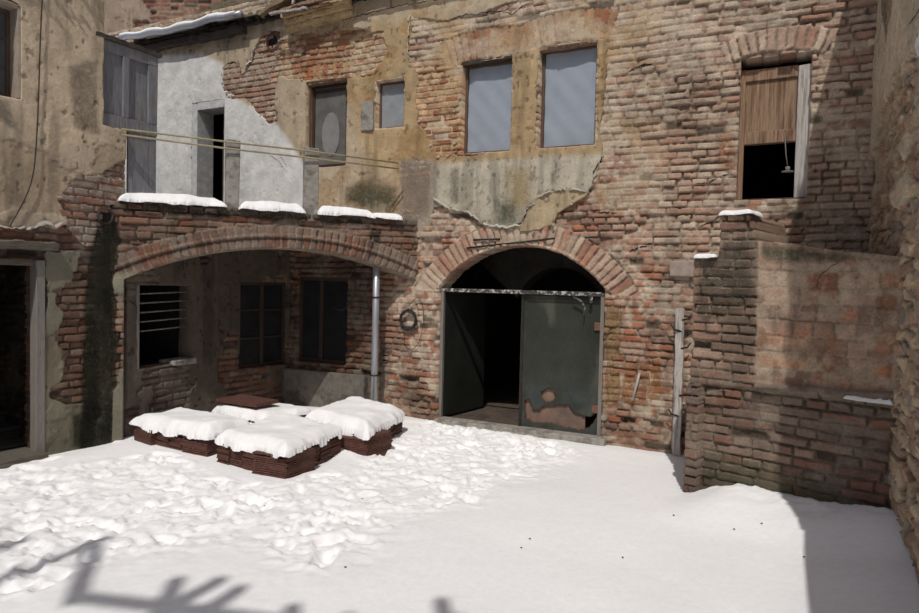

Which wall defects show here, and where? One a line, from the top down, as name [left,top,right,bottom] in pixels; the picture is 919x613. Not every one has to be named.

spalling [221,28,387,125]
spalling [0,172,125,246]
peeling [433,186,590,233]
spalling [50,260,101,407]